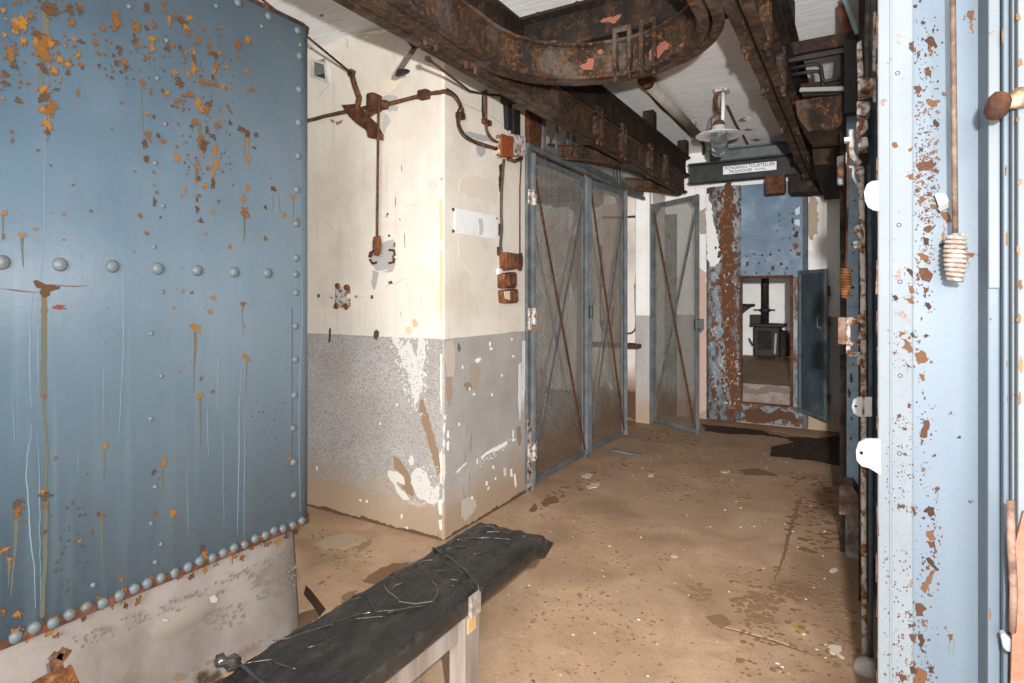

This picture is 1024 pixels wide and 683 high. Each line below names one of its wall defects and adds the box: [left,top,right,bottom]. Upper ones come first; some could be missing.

corrosion [0,0,259,238]
corrosion [263,178,300,225]
corrosion [0,280,106,643]
corrosion [95,576,142,609]
corrosion [151,456,177,561]
corrosion [179,324,215,447]
corrosion [177,545,219,580]
peeling [388,339,517,531]
peeling [511,338,525,418]
damp [649,424,861,678]
corrosion [714,183,801,424]
corrosion [883,0,955,683]